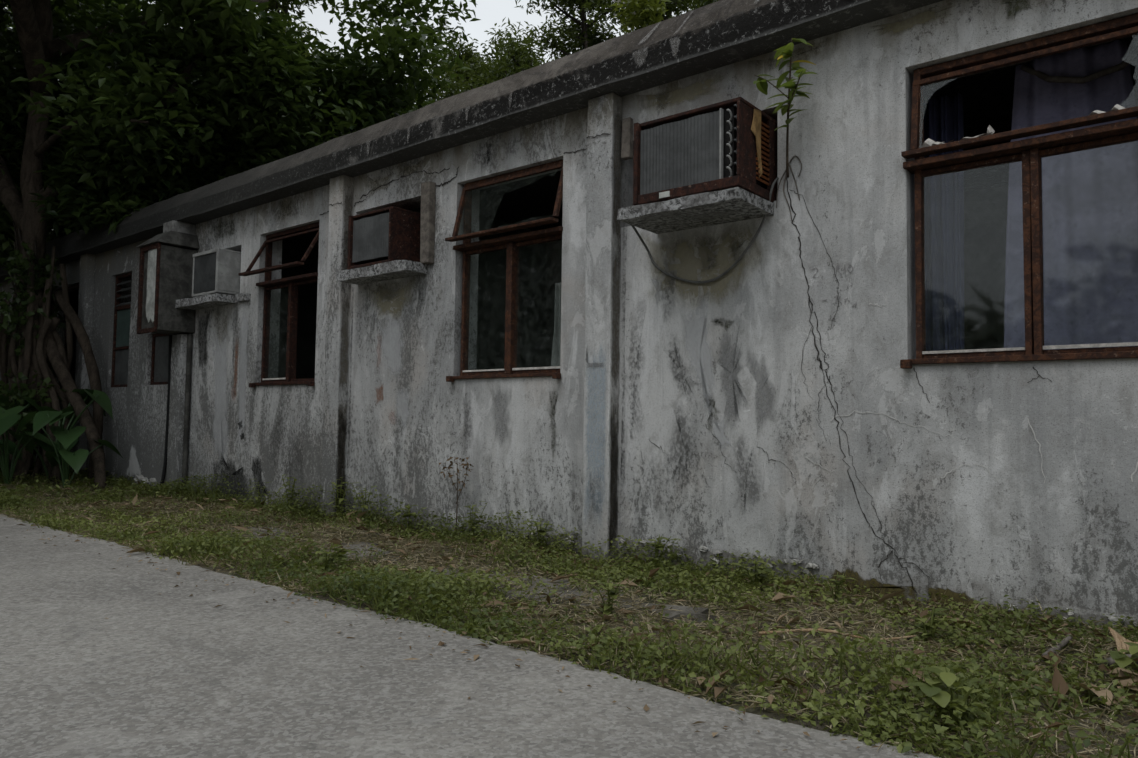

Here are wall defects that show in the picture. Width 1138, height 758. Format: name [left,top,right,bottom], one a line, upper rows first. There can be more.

leakage [705,318,773,426]
crack [786,178,930,593]